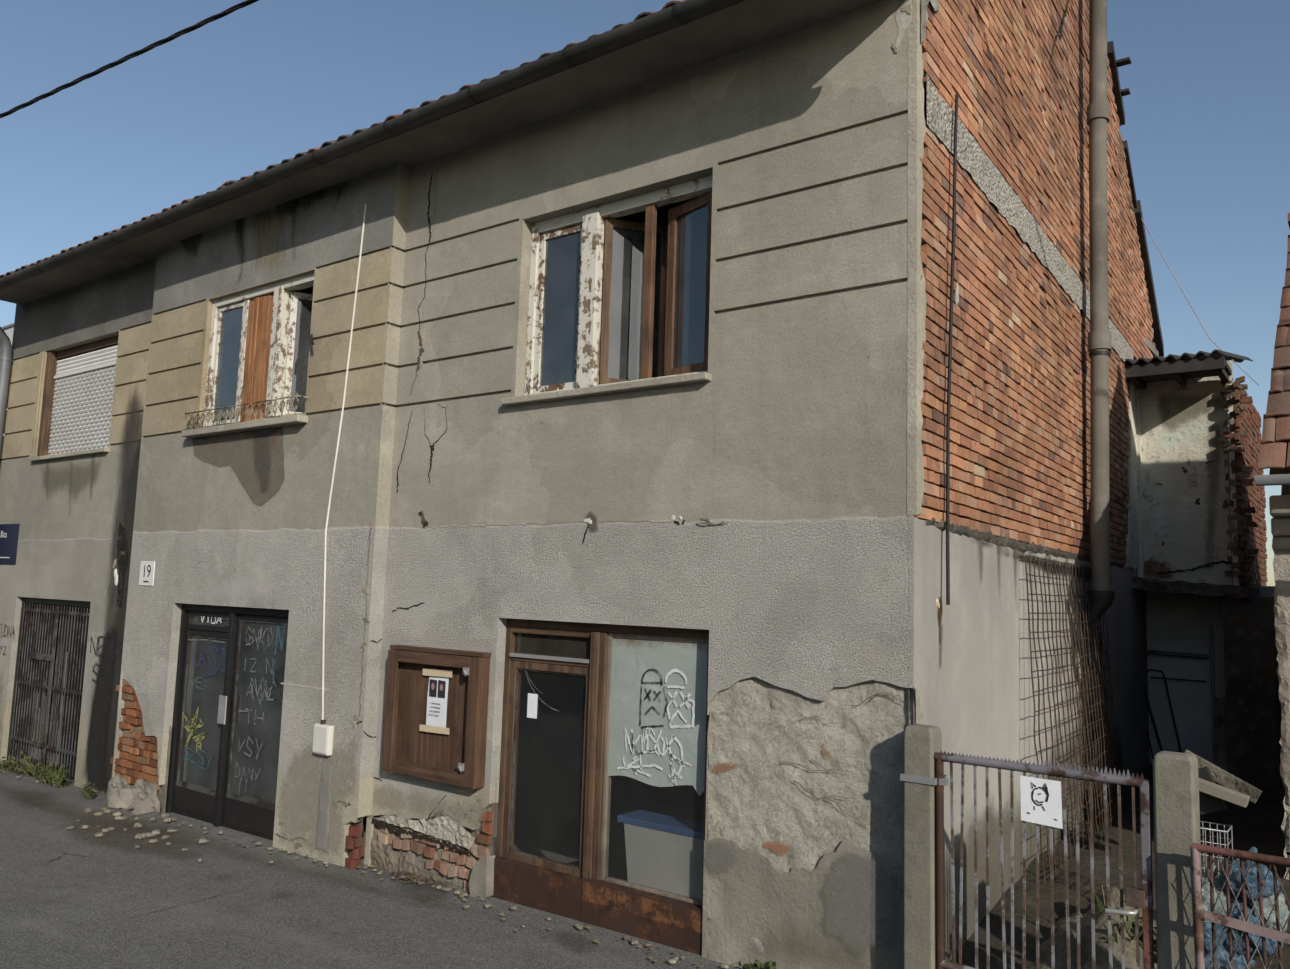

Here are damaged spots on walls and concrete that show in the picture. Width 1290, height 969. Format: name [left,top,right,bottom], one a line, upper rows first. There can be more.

crack [396,172,447,492]
damp [192,427,285,506]
damp [86,397,141,793]
flaking render [107,676,172,813]
flaking render [276,750,496,900]
spalling [702,677,924,969]
rust [582,881,703,933]